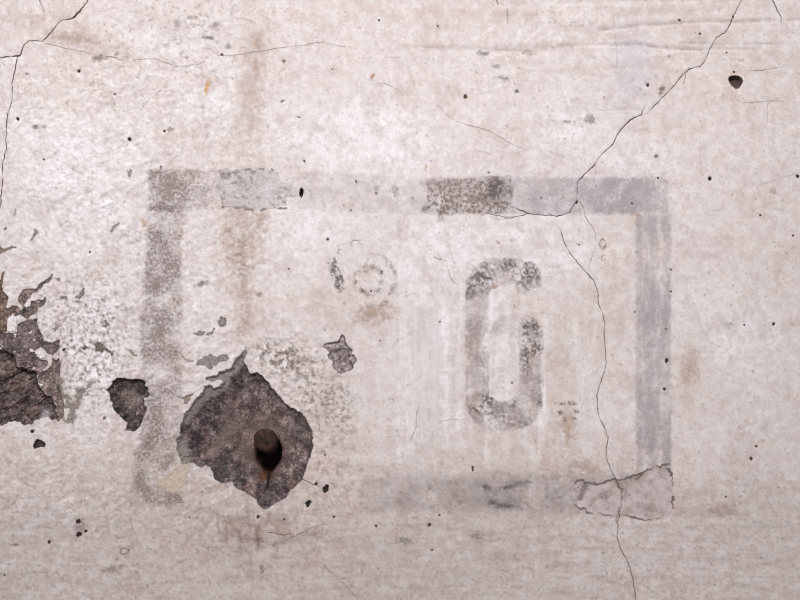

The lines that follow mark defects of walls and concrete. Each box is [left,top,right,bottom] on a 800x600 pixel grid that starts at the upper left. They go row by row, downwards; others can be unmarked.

crack [0,0,88,206]
flaking render [0,272,96,449]
spalling [106,378,150,432]
spalling [175,345,314,519]
spalling [323,335,357,374]
flaking render [573,463,675,521]
crack [513,1,741,600]